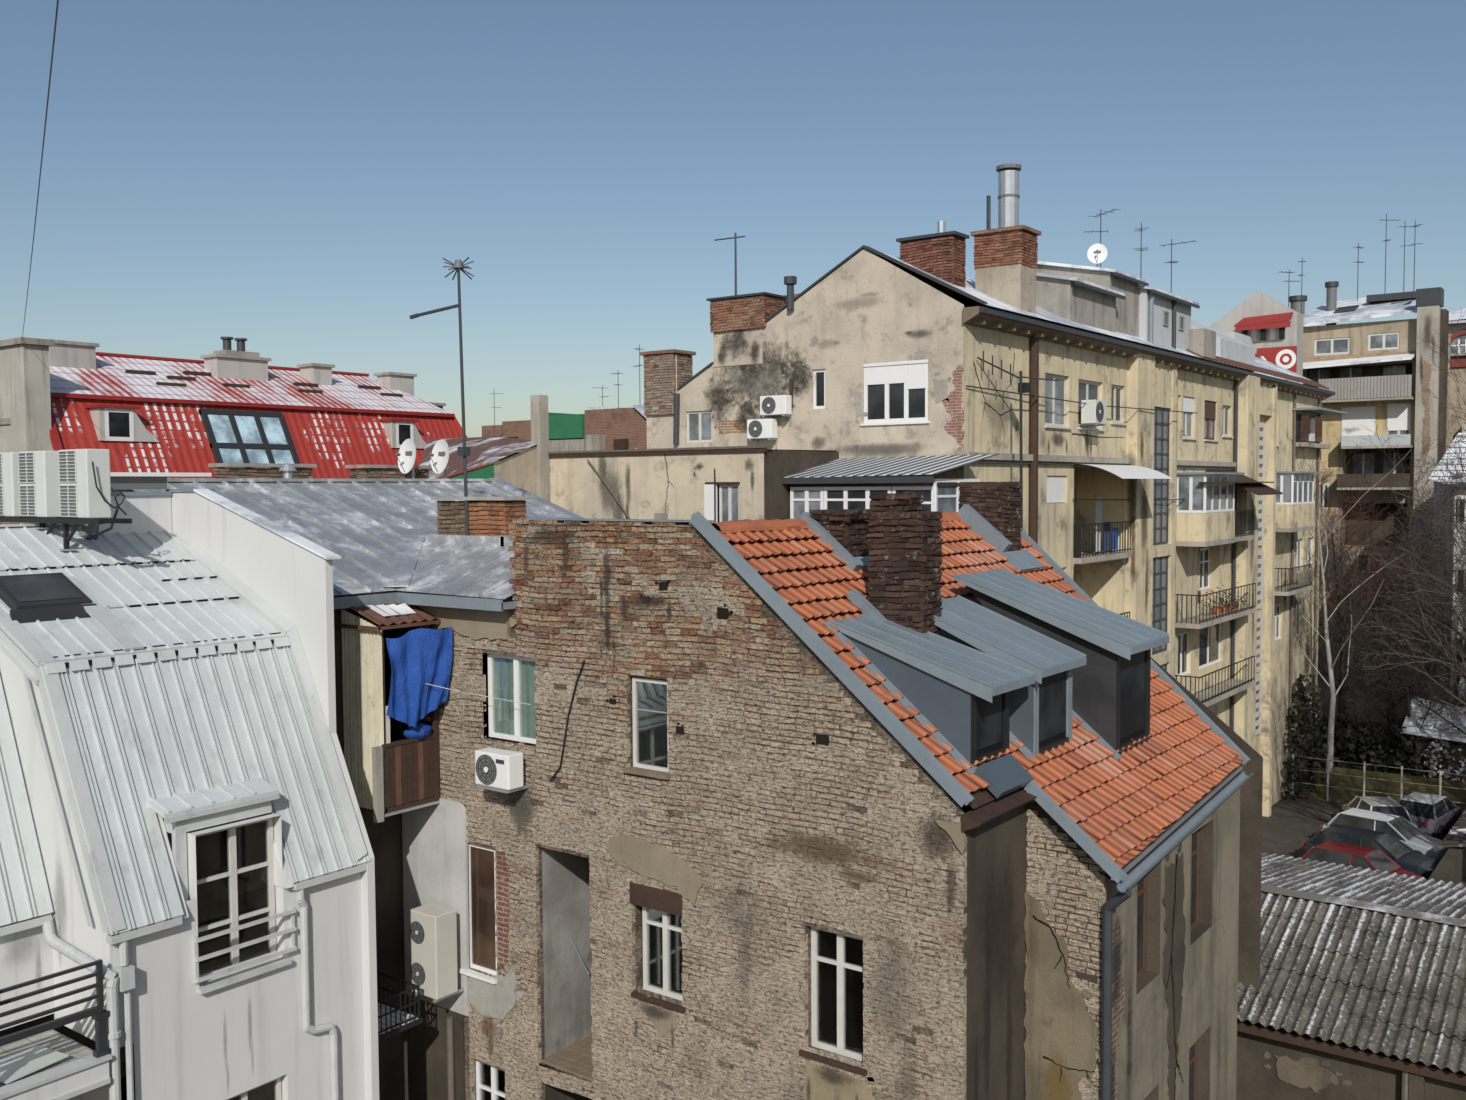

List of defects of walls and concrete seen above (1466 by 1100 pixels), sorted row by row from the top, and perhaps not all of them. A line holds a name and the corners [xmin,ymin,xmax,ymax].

mould [710,330,811,423]
flaking render [933,365,965,451]
flaking render [1024,892,1126,1100]